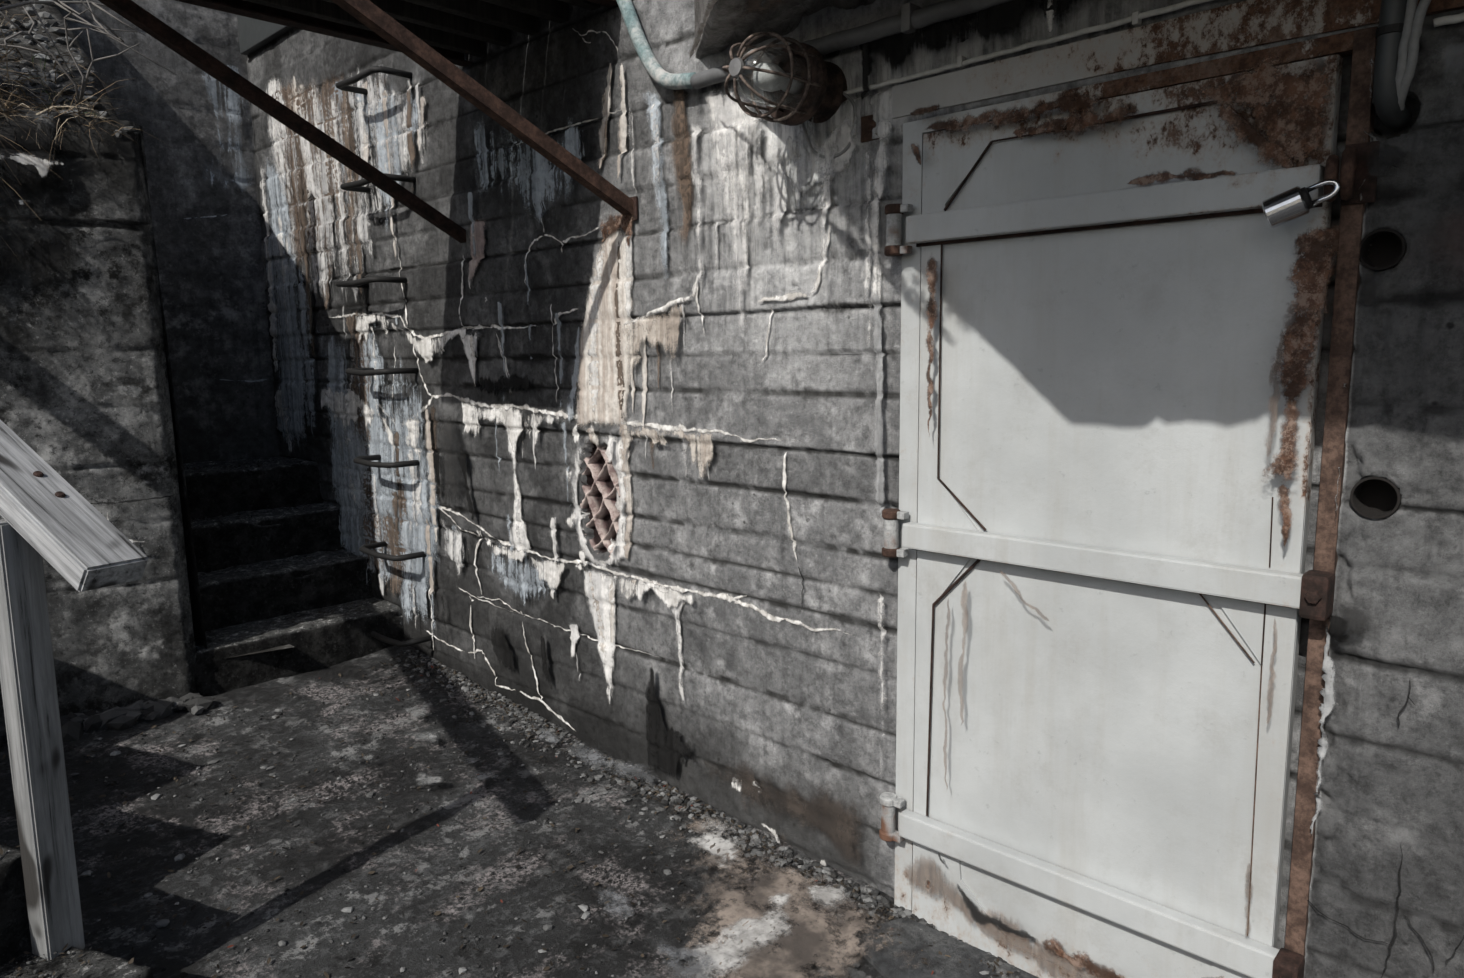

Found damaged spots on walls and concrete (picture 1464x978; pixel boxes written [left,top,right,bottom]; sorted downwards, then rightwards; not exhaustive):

damp [692,91,882,338]
corrosion [910,89,1137,138]
corrosion [1127,168,1236,186]
damp [266,64,713,703]
corrosion [926,258,938,435]
corrosion [1264,226,1340,546]
spalling [566,425,622,577]
damp [540,668,691,782]
crack [1397,680,1415,728]
damp [603,891,633,915]
corrosion [905,853,1124,978]
crack [1307,847,1464,978]